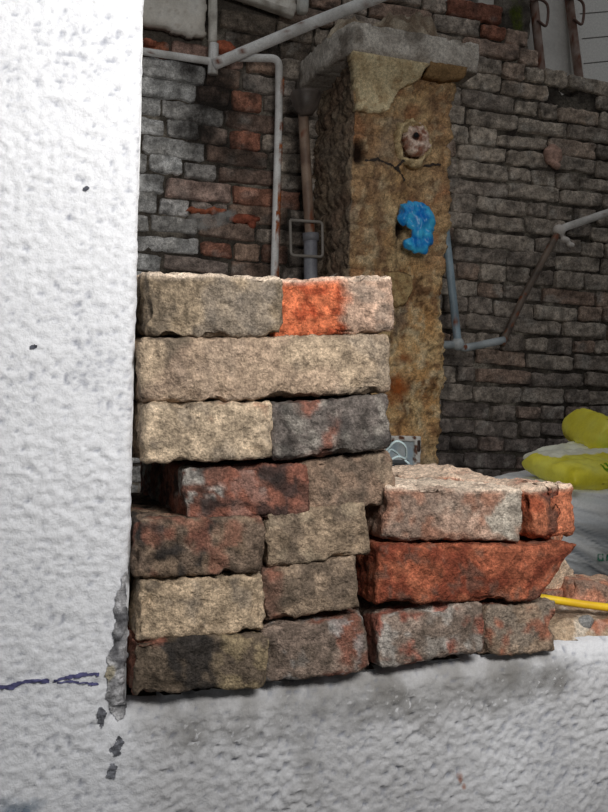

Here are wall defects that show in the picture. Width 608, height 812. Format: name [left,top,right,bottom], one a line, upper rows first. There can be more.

spalling [143,37,157,48]
spalling [217,40,236,55]
peeling [347,50,468,114]
spalling [97,571,129,728]
spalling [106,736,124,779]